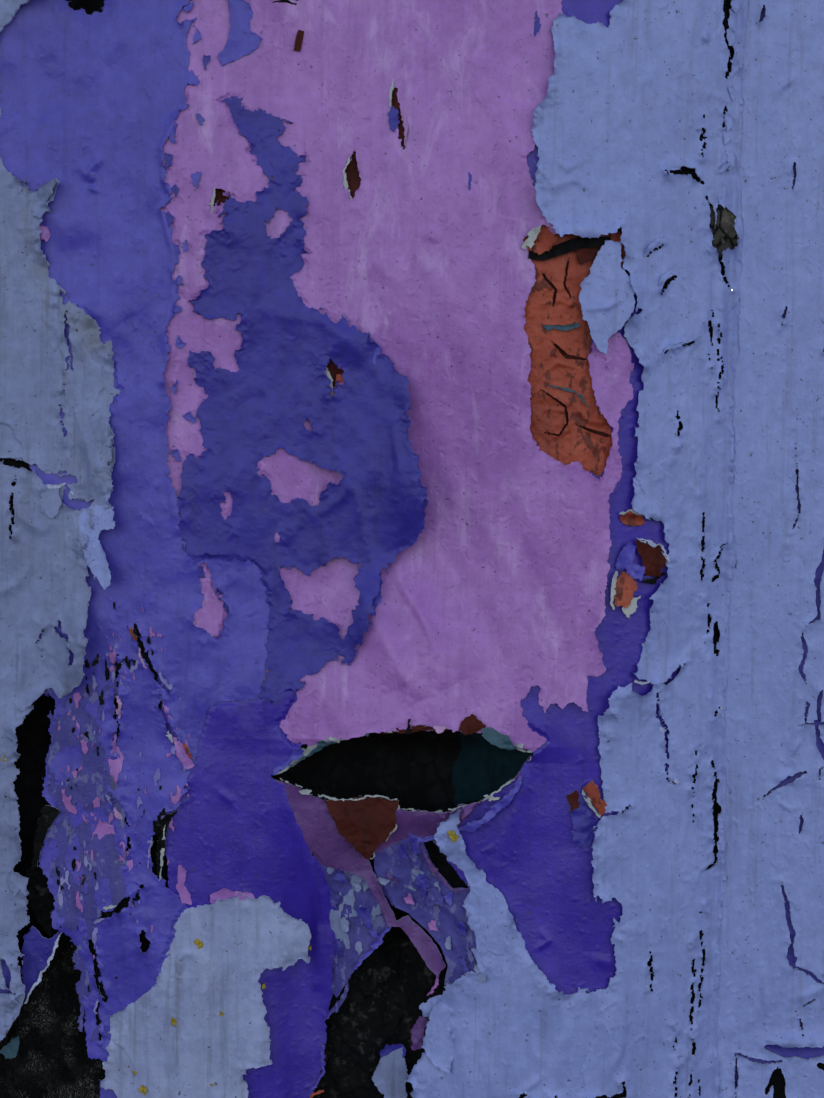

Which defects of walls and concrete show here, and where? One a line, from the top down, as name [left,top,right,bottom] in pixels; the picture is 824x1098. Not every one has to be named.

peeling [658,270,681,295]
crack [663,275,677,292]
crack [668,310,723,412]
crack [0,458,85,538]
peeling [0,0,642,1098]
crack [700,512,728,654]
crack [792,443,801,529]
crack [764,550,824,796]
peeling [656,692,670,780]
crack [646,951,654,991]
crack [673,911,705,1098]
crack [734,885,824,1098]